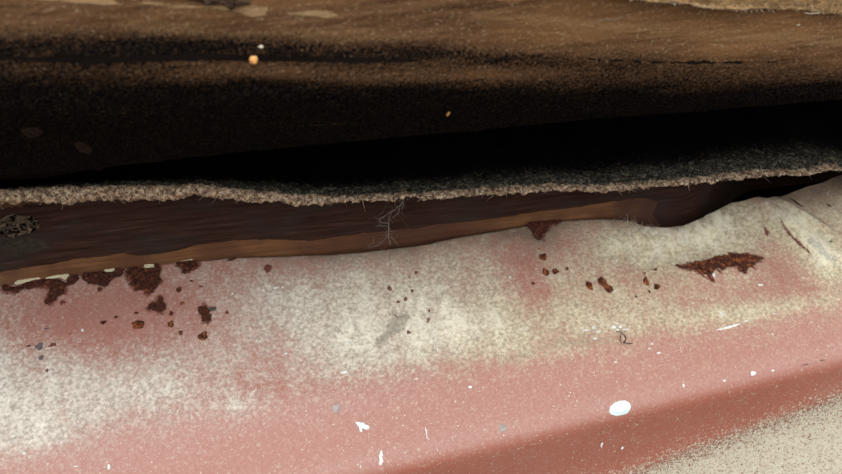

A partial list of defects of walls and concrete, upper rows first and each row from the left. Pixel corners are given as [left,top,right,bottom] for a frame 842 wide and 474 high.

rust [176,260,202,287]
rust [526,219,568,276]
rust [675,250,763,282]
rust [1,263,182,335]
rust [198,303,229,341]